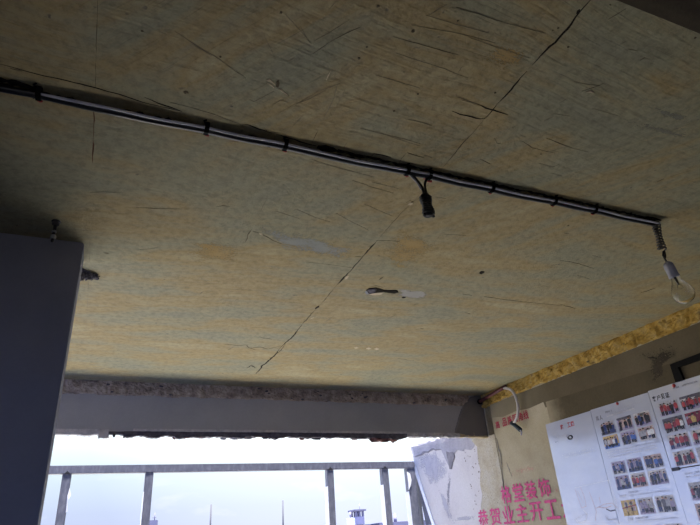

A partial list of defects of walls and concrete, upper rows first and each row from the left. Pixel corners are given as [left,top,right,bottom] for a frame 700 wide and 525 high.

crack [444,1,590,166]
spalling [80,268,100,281]
crack [228,186,427,375]
spalling [62,379,469,406]